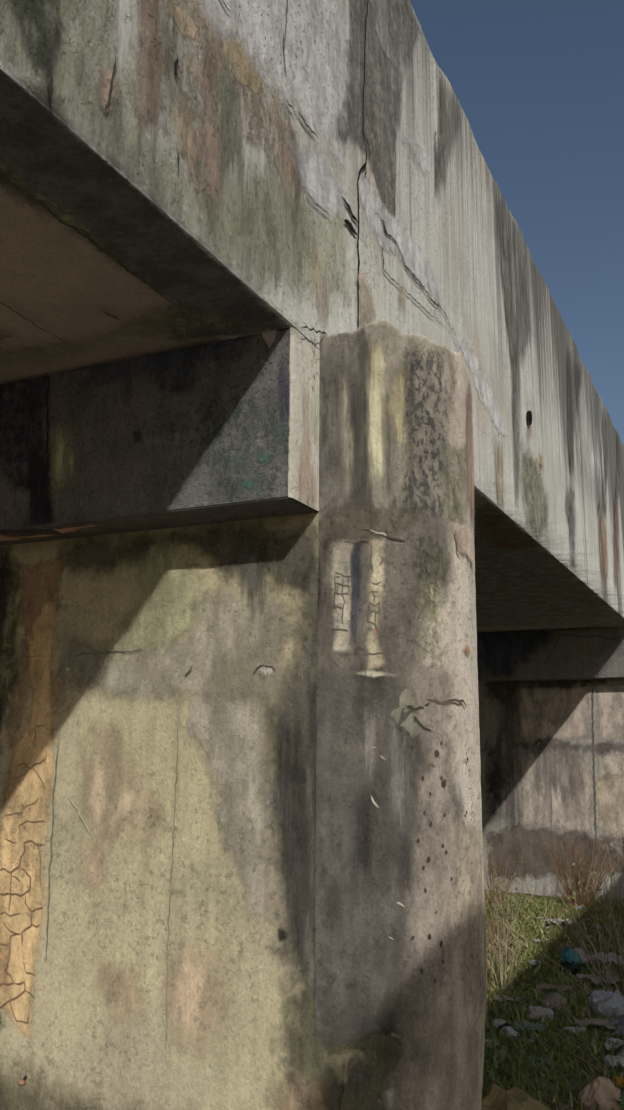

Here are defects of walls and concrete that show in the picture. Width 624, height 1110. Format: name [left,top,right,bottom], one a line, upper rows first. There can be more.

damp [0,0,461,396]
damp [473,199,624,676]
crack [0,712,93,1023]
damp [0,318,624,1110]
crack [426,699,467,707]